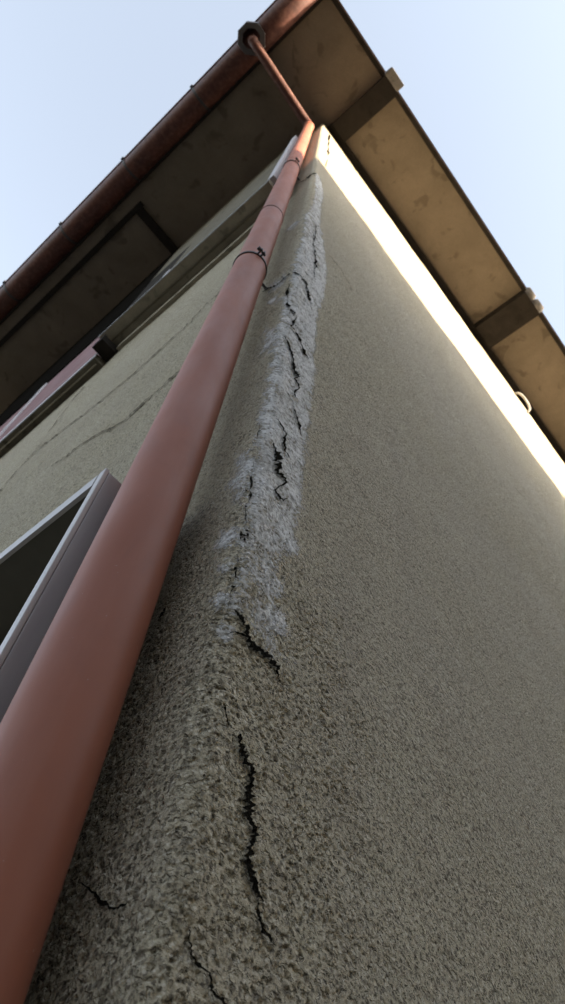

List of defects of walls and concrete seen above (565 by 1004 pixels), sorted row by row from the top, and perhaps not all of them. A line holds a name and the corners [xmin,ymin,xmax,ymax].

crack [0,292,219,491]
crack [228,232,352,682]
crack [77,882,127,910]
crack [188,929,227,1004]
crack [224,706,276,946]